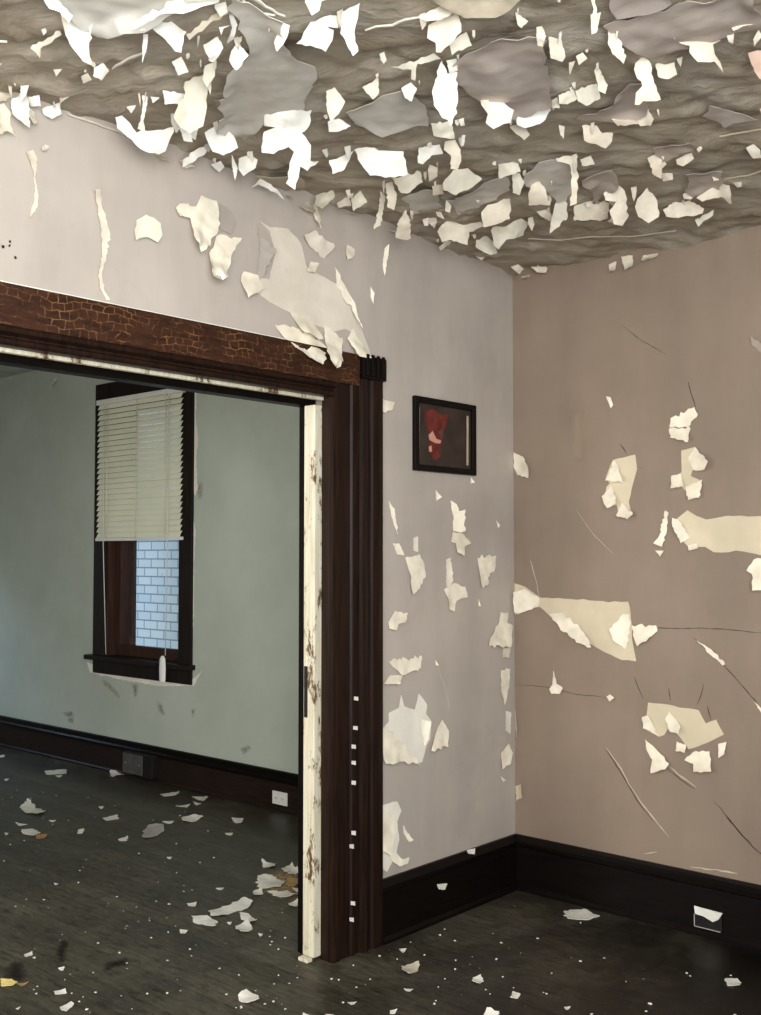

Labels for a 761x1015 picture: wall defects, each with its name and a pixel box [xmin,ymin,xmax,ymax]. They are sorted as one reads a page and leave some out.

peeling [0,0,761,368]
crack [750,336,761,352]
peeling [602,444,642,519]
peeling [654,382,761,591]
peeling [389,502,426,594]
peeling [436,491,471,612]
peeling [478,555,496,588]
peeling [388,611,408,630]
peeling [383,656,449,765]
peeling [642,685,726,788]
crack [694,638,761,712]
crack [605,747,669,837]